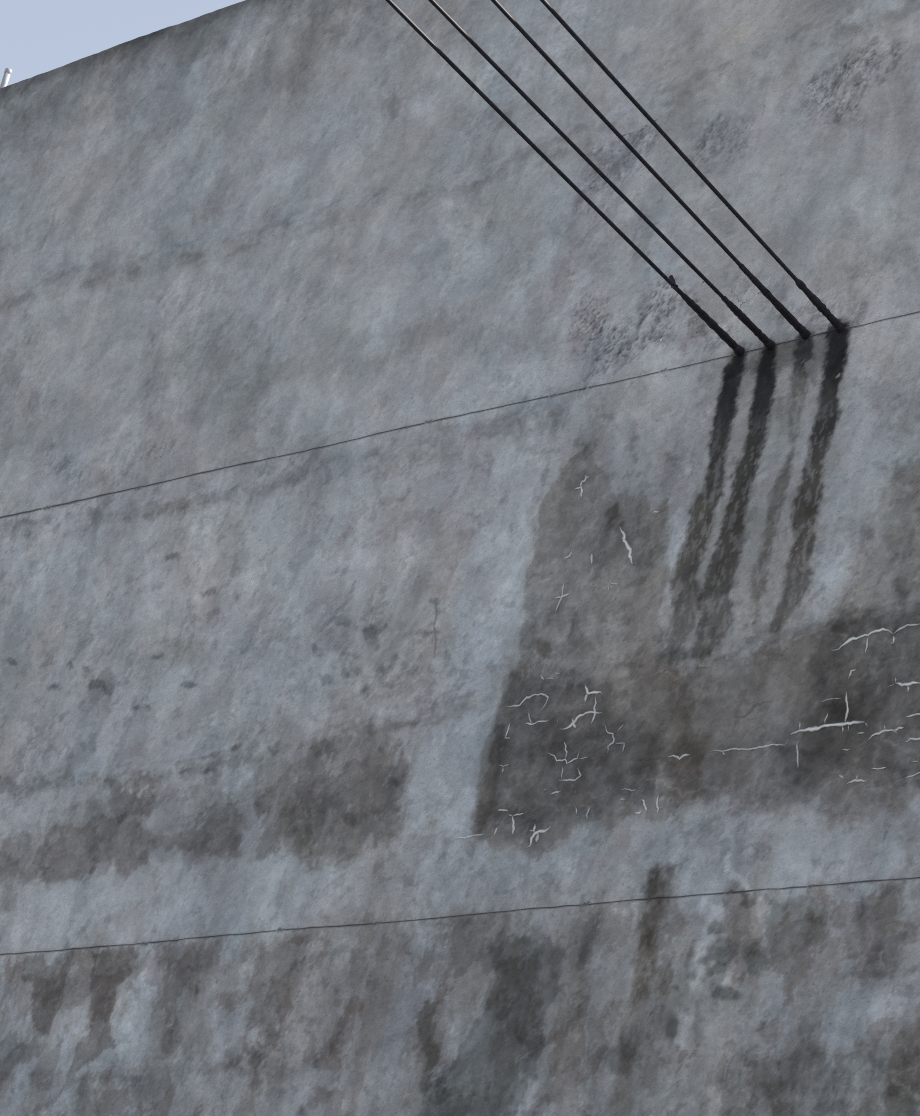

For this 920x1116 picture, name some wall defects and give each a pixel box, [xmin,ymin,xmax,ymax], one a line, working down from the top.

water stain [458,313,920,867]
crack [455,809,551,848]
crack [499,672,625,821]
crack [619,788,662,814]
crack [668,623,920,785]